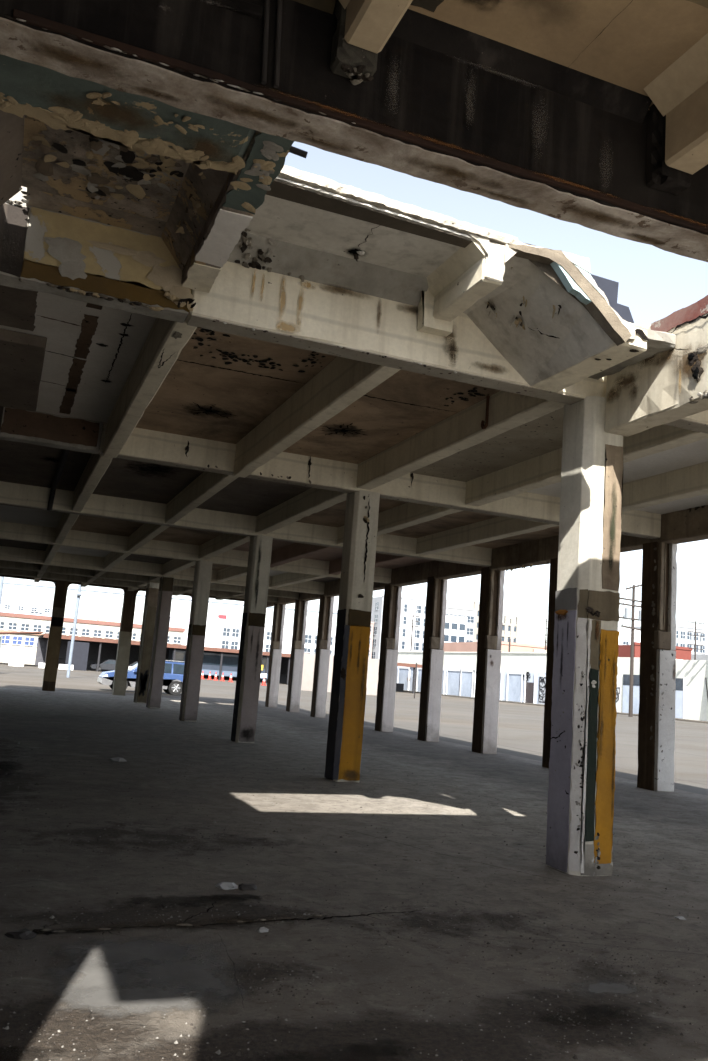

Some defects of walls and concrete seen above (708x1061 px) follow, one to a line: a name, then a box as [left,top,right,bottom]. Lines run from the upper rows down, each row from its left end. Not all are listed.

spalling [104,45,282,101]
peeling [0,92,284,213]
peeling [43,237,196,311]
spalling [234,228,278,272]
spalling [658,344,708,404]
crack [32,899,422,1004]